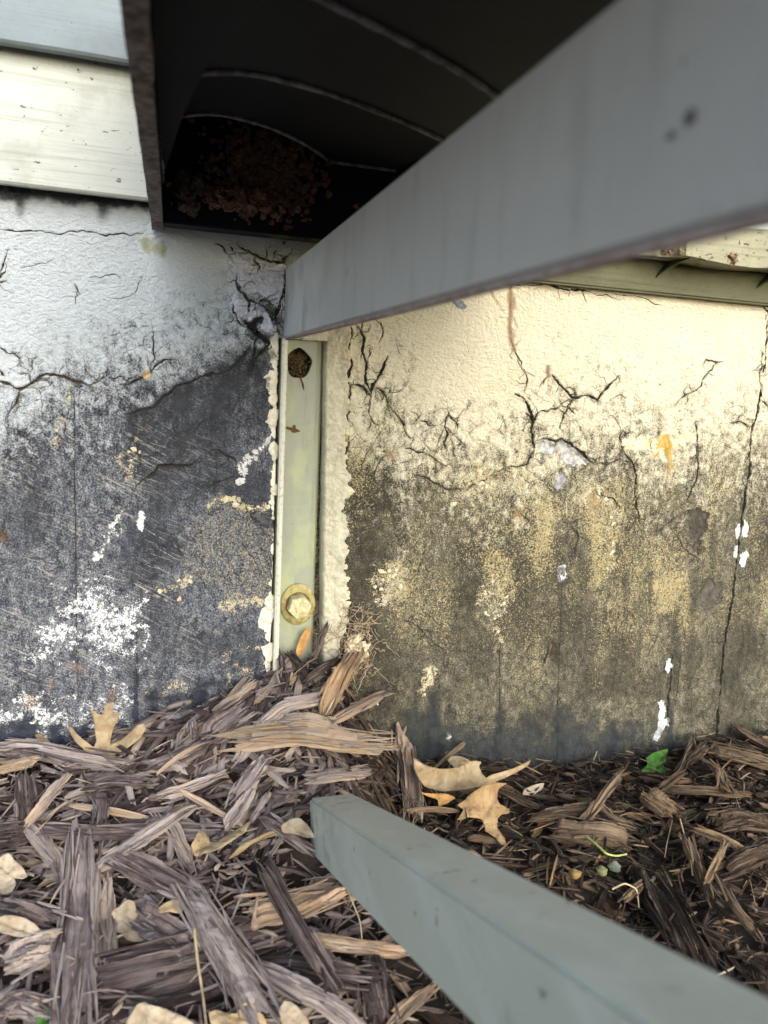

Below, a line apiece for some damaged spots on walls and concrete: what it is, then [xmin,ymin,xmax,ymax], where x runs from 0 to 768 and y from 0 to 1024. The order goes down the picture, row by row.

crack [0,229,142,294]
crack [0,243,292,692]
crack [345,320,721,563]
spalling [537,438,589,489]
rust [649,434,673,466]
crack [715,307,768,736]
leakage [0,711,91,745]
leakage [112,674,226,734]
leakage [374,694,655,771]
leakage [661,701,673,751]